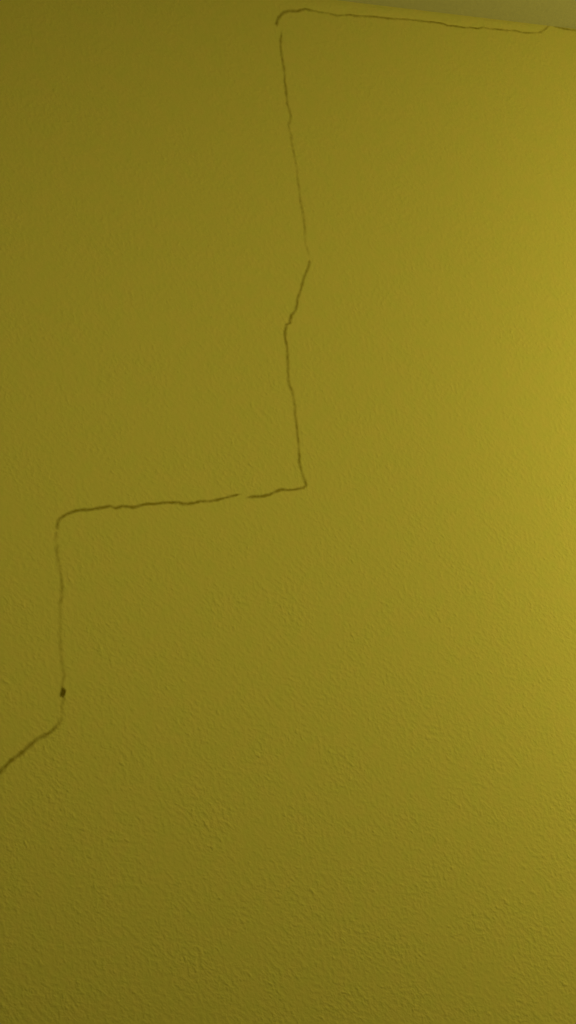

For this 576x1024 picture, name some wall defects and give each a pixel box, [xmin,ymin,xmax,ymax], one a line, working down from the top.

crack [57,453,306,525]
crack [0,729,54,772]